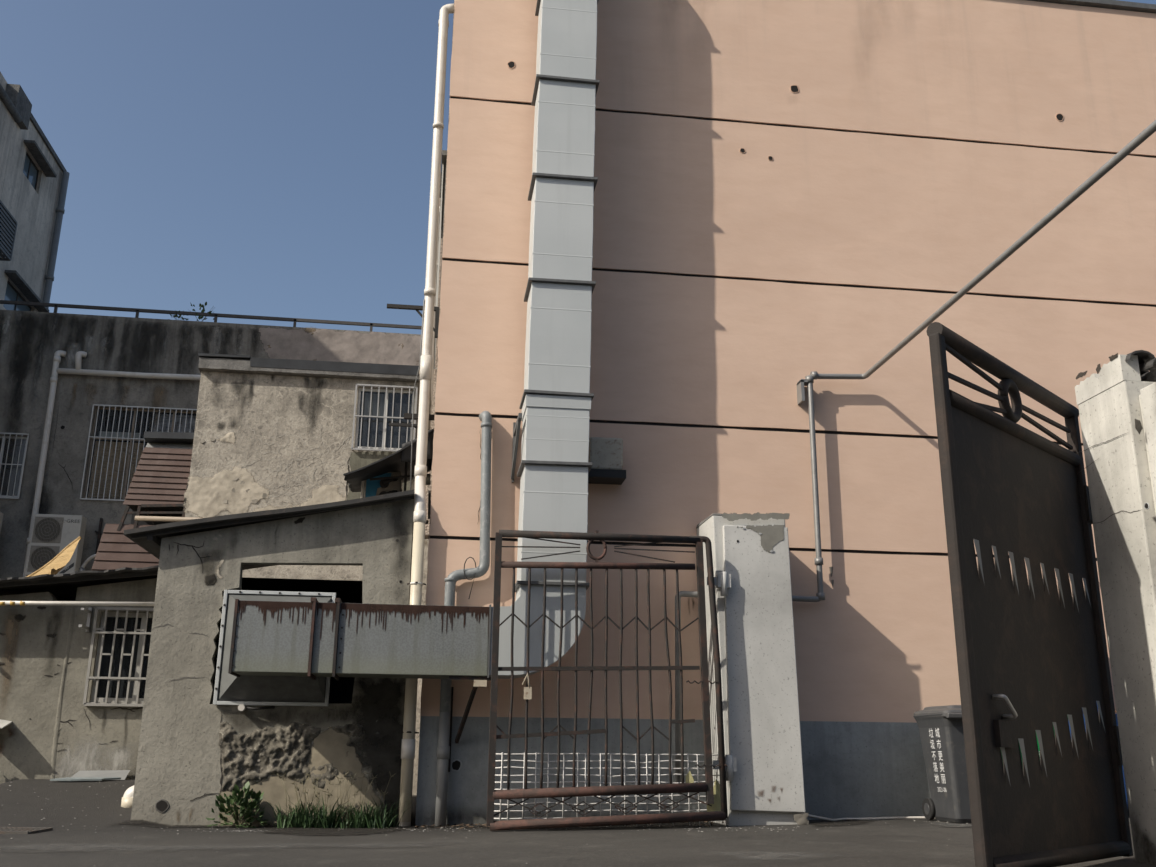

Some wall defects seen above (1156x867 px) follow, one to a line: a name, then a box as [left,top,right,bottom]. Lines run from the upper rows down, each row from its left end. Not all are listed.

leakage [0,314,257,398]
peeling [722,512,790,553]
crack [169,542,204,573]
rust [239,600,489,640]
spalling [219,722,365,792]